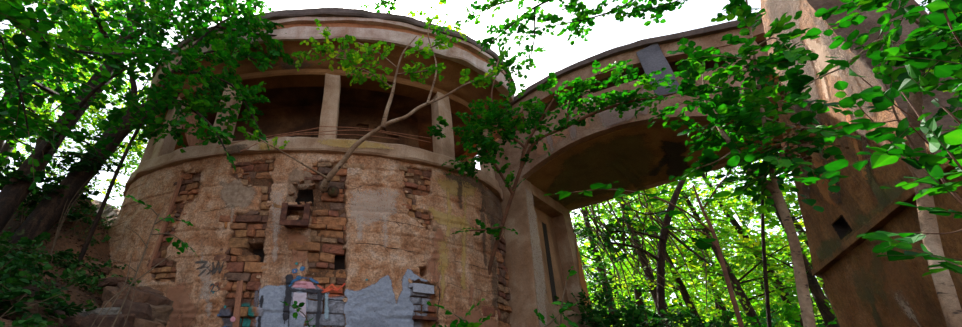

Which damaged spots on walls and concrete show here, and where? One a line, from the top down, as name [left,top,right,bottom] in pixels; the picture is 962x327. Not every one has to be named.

spalling [146,170,201,282]
spalling [208,160,364,327]
spalling [399,165,446,327]
spalling [482,235,512,327]